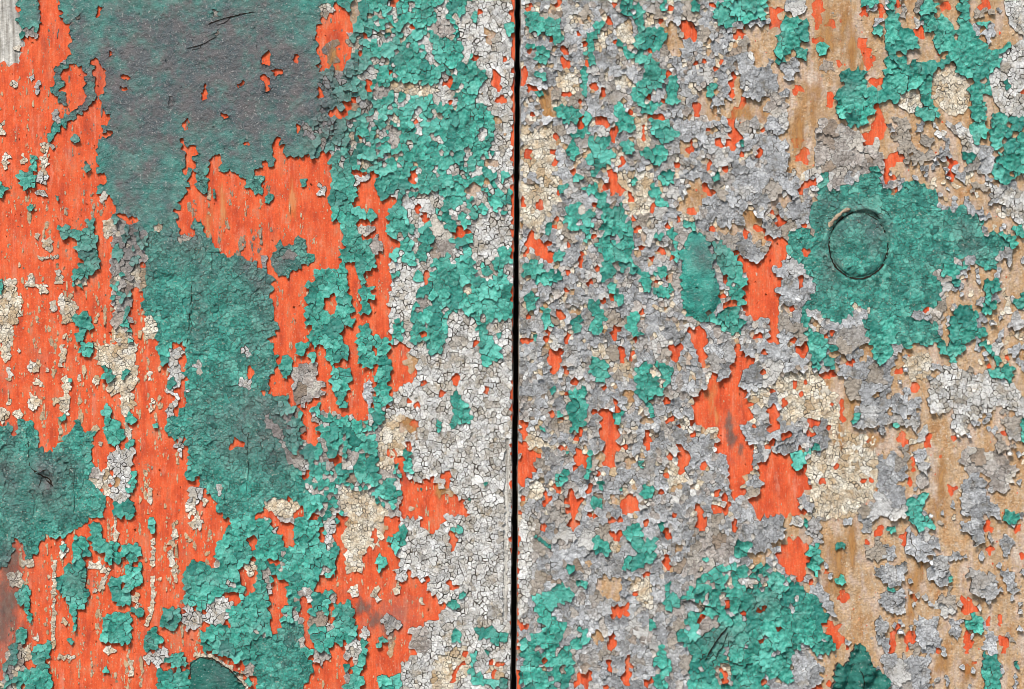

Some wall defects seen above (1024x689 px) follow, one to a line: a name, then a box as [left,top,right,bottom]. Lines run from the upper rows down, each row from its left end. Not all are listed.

crack [186,12,251,50]
peeling [0,0,515,689]
peeling [516,0,1024,689]